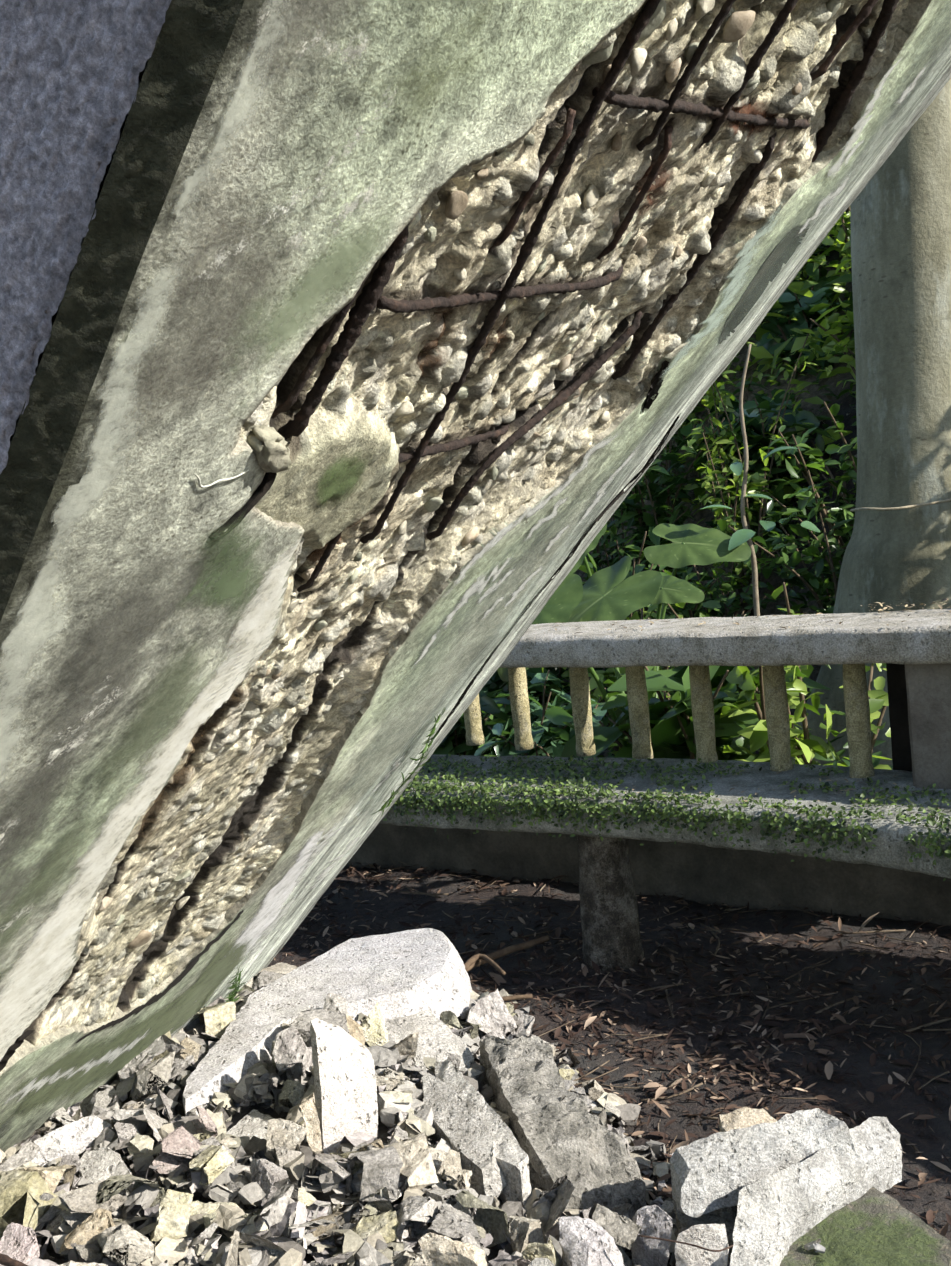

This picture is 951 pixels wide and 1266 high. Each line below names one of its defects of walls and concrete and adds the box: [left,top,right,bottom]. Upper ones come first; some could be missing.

efflorescence [0,269,172,782]
efflorescence [176,0,284,224]
spalling [17,0,909,1046]
corrosion [271,0,899,592]
water stain [7,1033,146,1103]
water stain [0,541,300,1060]
crack [76,909,245,1043]
water stain [233,831,359,968]